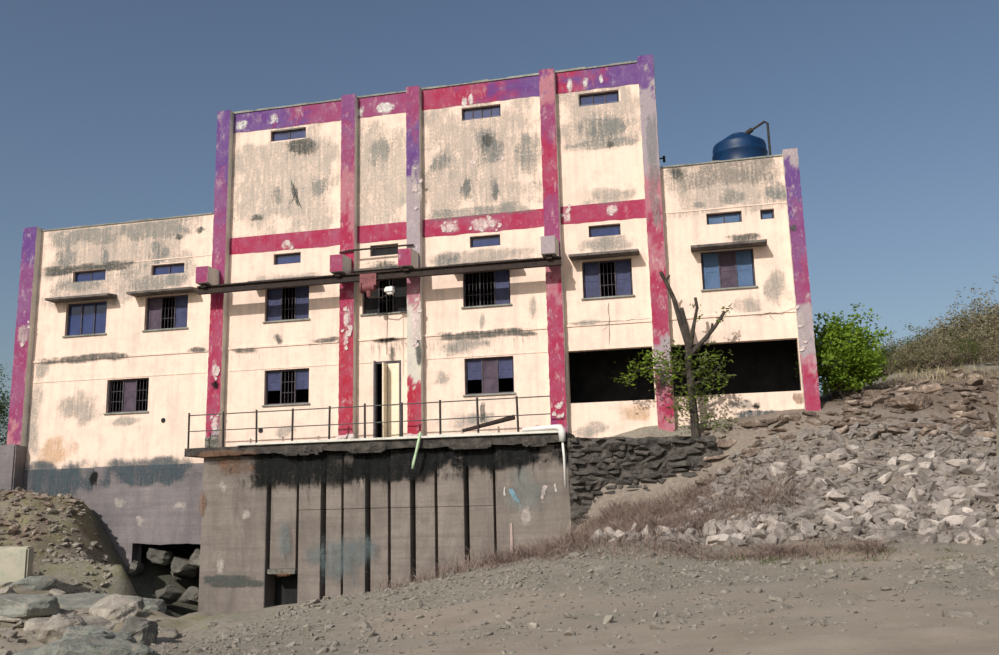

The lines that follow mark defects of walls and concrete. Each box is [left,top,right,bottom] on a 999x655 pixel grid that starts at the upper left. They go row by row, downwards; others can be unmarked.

leakage [288,139,315,154]
leakage [481,132,504,162]
leakage [591,119,624,147]
peeling [469,215,502,232]
leakage [45,250,132,276]
peeling [341,306,353,350]
leakage [441,328,535,352]
leakage [26,440,192,496]
leakage [243,442,569,487]